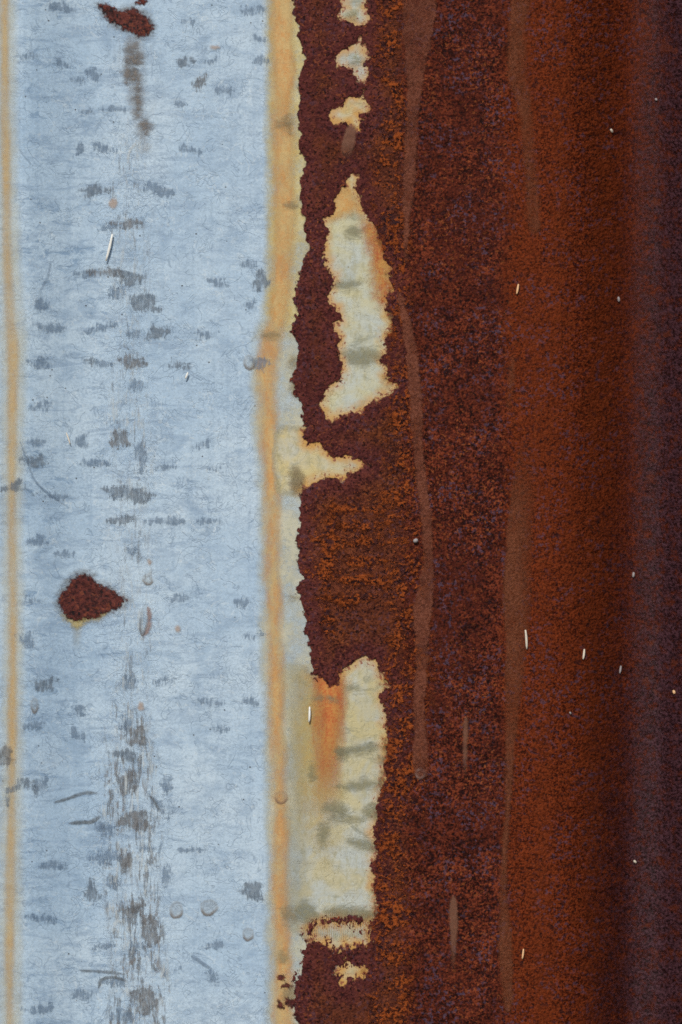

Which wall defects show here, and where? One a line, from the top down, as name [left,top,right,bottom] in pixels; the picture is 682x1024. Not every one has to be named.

corrosion [98,0,155,134]
corrosion [253,0,682,1024]
corrosion [57,573,127,628]